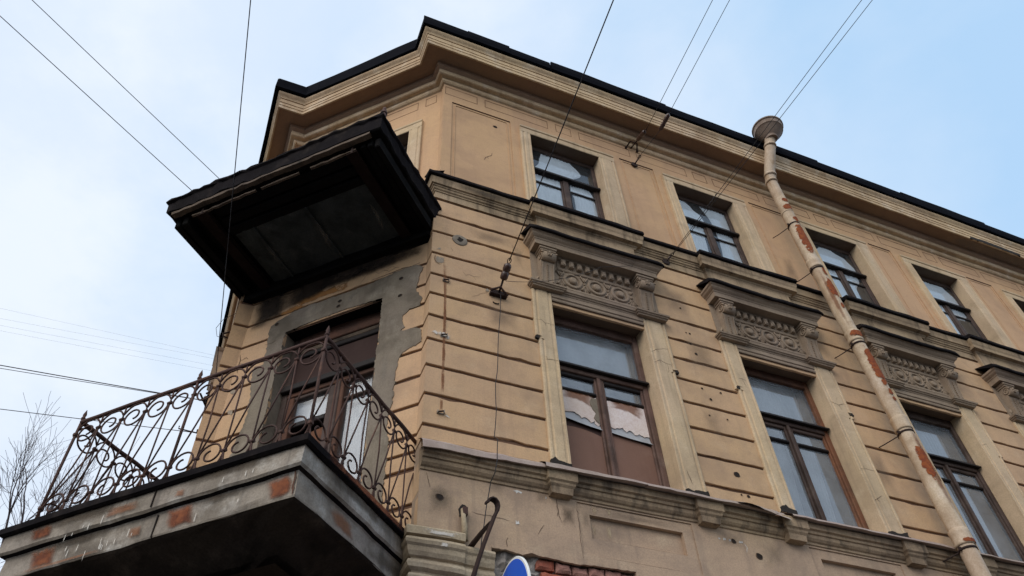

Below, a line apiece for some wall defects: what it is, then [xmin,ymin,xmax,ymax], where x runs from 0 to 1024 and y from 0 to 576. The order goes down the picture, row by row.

rust [782,198,814,253]
rust [822,267,845,311]
rust [864,348,897,400]